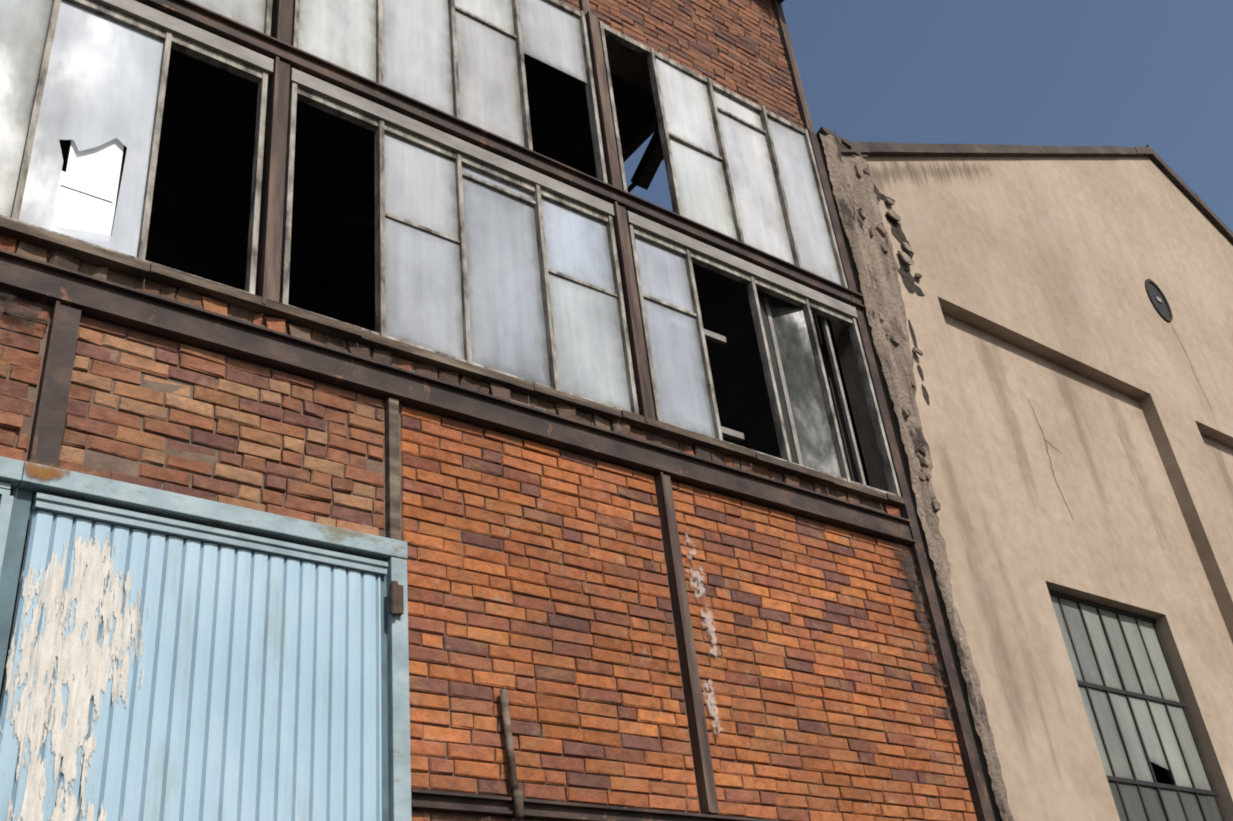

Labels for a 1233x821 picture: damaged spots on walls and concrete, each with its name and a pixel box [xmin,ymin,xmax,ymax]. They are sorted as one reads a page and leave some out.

rust [25,461,70,480]
flaking render [820,134,1015,821]
peeling [0,532,148,821]